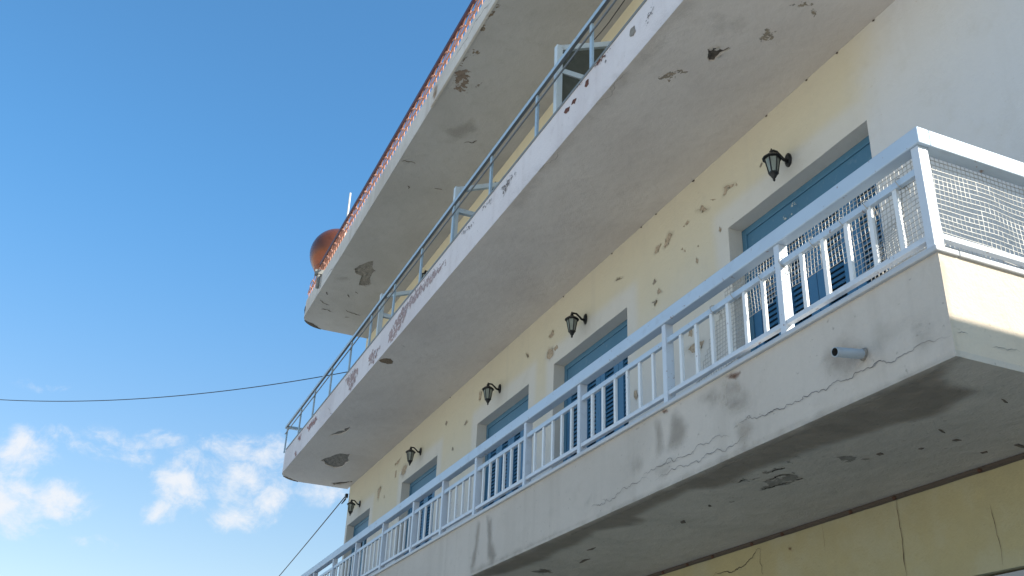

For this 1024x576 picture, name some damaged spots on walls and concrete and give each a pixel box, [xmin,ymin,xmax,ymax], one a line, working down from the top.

peeling [454,49,480,92]
spalling [708,47,729,60]
peeling [345,259,446,391]
crack [599,331,965,506]
spalling [323,453,350,467]